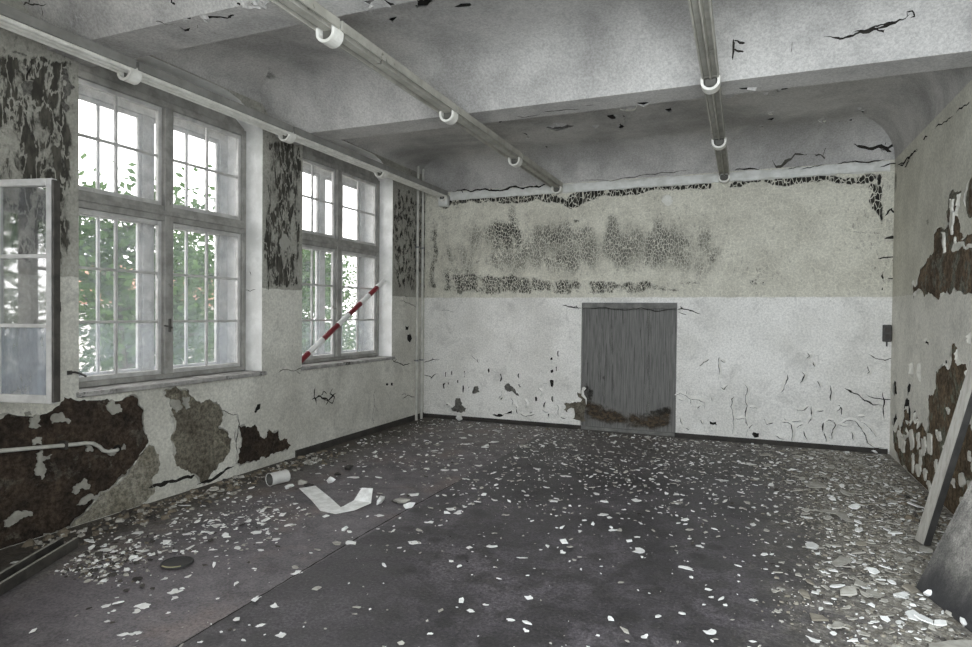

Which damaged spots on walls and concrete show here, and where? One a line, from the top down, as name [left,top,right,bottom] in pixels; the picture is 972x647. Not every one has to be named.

crack [825,10,915,40]
peeling [0,55,75,267]
crack [736,102,969,170]
peeling [264,142,301,290]
leakage [494,224,522,250]
leakage [430,230,676,295]
peeling [443,183,711,271]
flaking render [912,178,972,301]
flaking render [0,394,160,549]
crack [149,410,240,488]
flaking render [163,386,291,485]
flaking render [892,332,971,491]